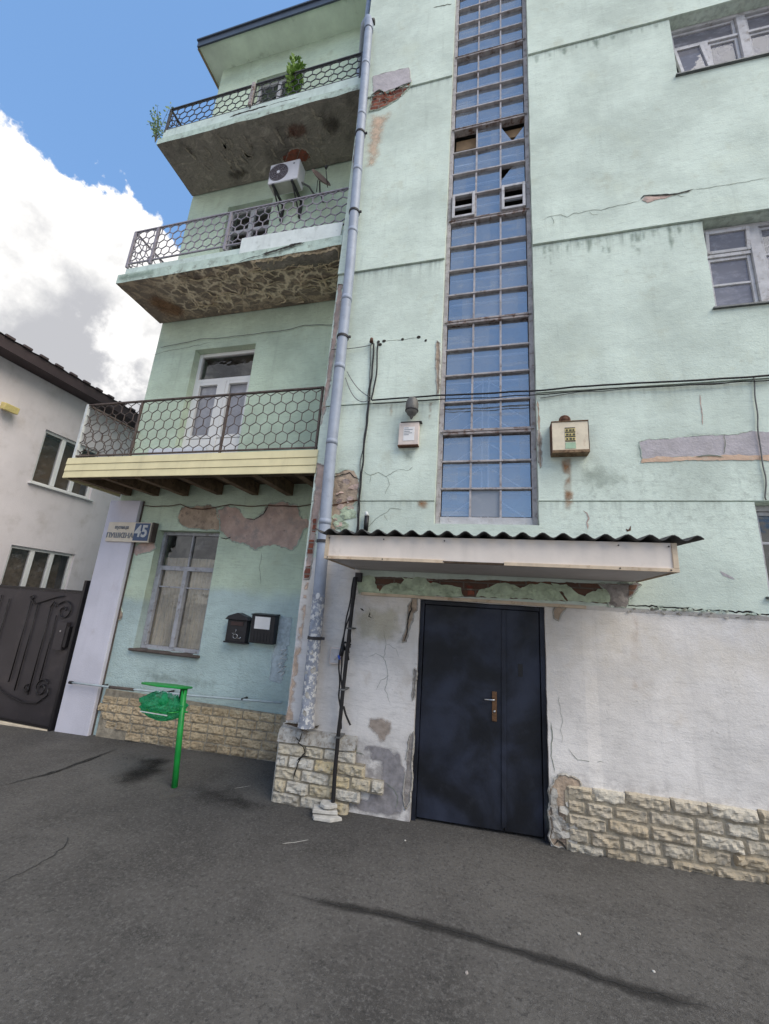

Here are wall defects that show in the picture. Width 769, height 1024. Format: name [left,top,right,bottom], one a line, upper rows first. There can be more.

flaking render [369,68,412,164]
crack [545,178,765,221]
peeling [639,430,769,463]
flaking render [178,462,360,580]
peeling [357,575,769,643]
crack [293,734,309,778]
peeling [369,719,391,741]
spalling [402,731,415,811]
flaking render [547,773,582,849]